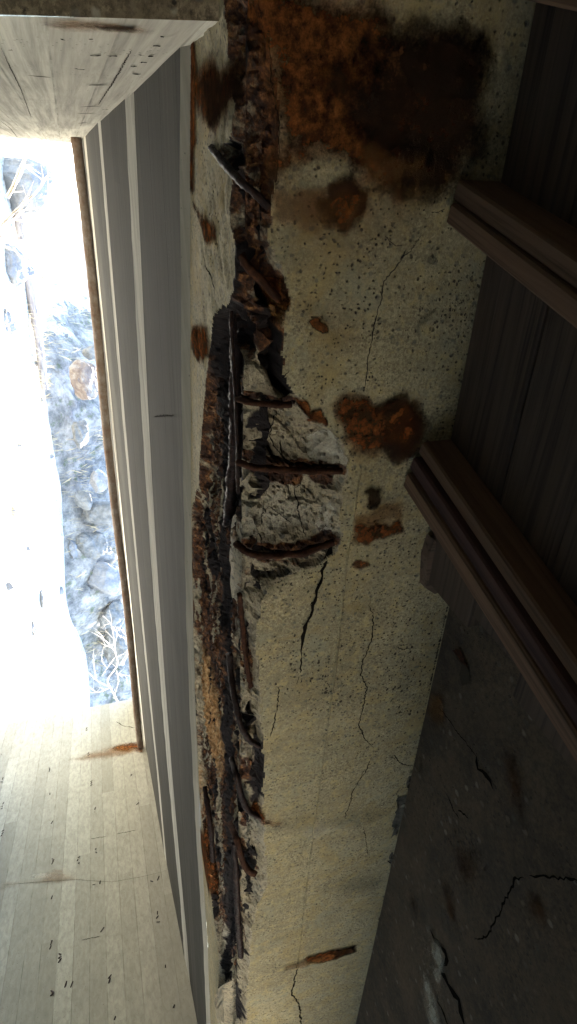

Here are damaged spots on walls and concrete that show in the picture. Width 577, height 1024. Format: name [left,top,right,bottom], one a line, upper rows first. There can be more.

corrosion [190,42,244,245]
corrosion [247,0,497,235]
corrosion [191,325,210,363]
spalling [191,0,353,1024]
corrosion [309,318,328,334]
corrosion [294,394,429,466]
corrosion [353,487,404,546]
crack [364,209,444,390]
crack [270,547,333,737]
crack [345,599,413,864]
corrosion [305,946,357,964]
crack [475,874,577,940]